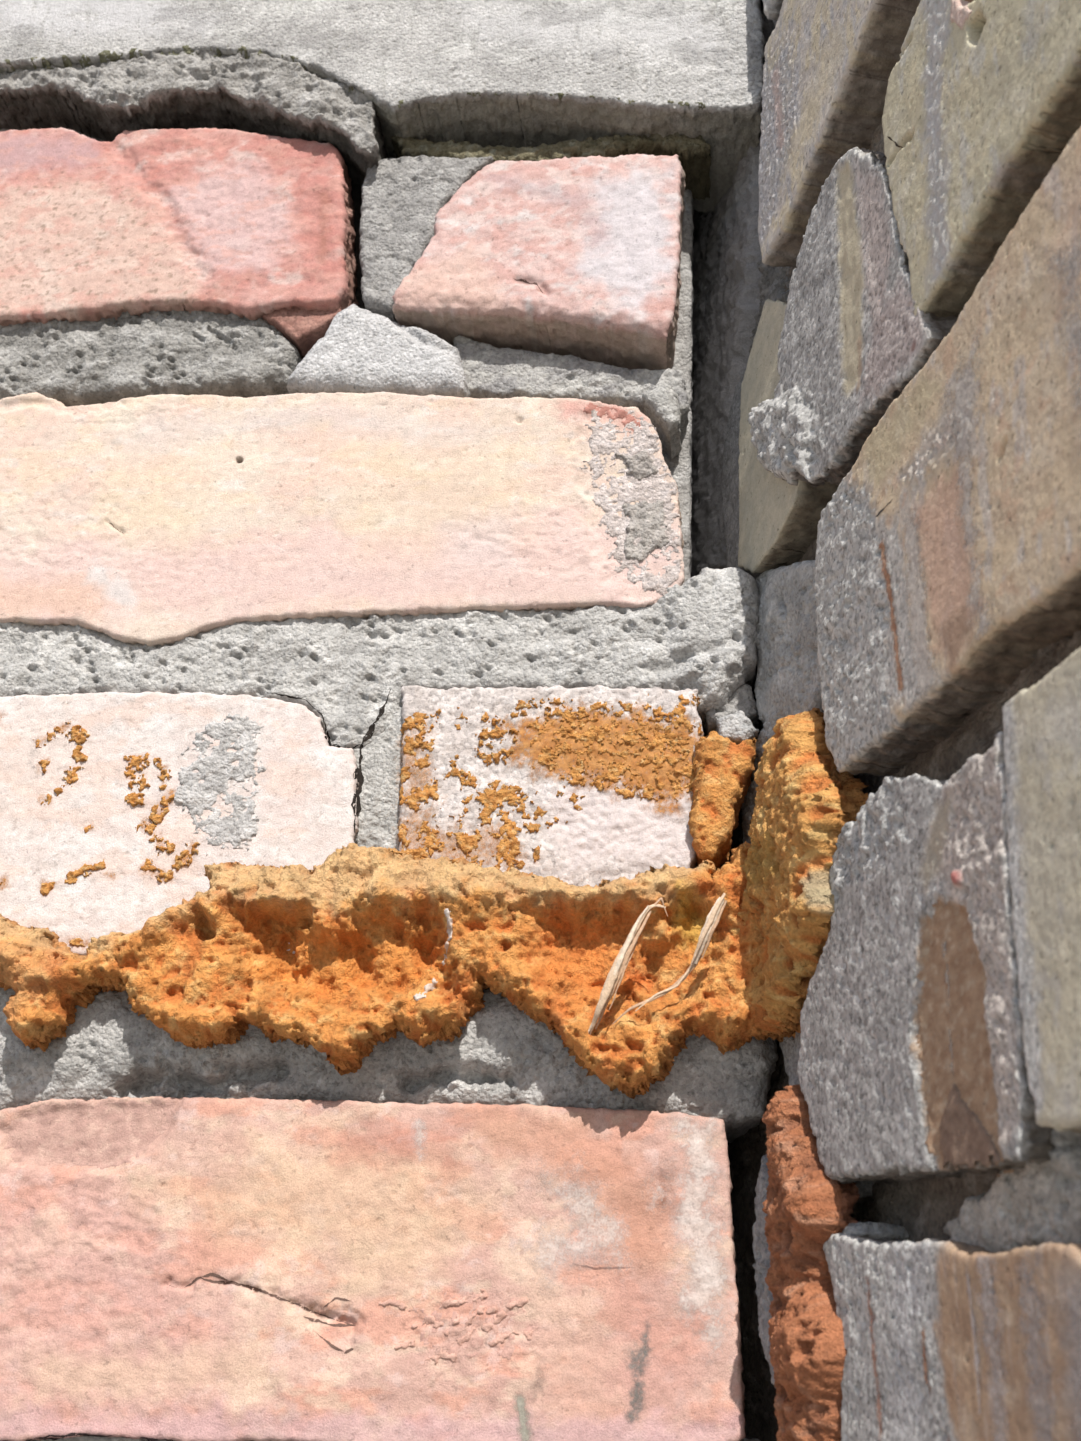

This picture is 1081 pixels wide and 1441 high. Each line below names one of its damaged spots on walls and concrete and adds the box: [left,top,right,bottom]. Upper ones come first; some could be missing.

peeling [950,0,974,30]
spalling [580,408,685,599]
spalling [174,713,268,856]
crack [267,689,391,844]
crack [169,1273,356,1354]